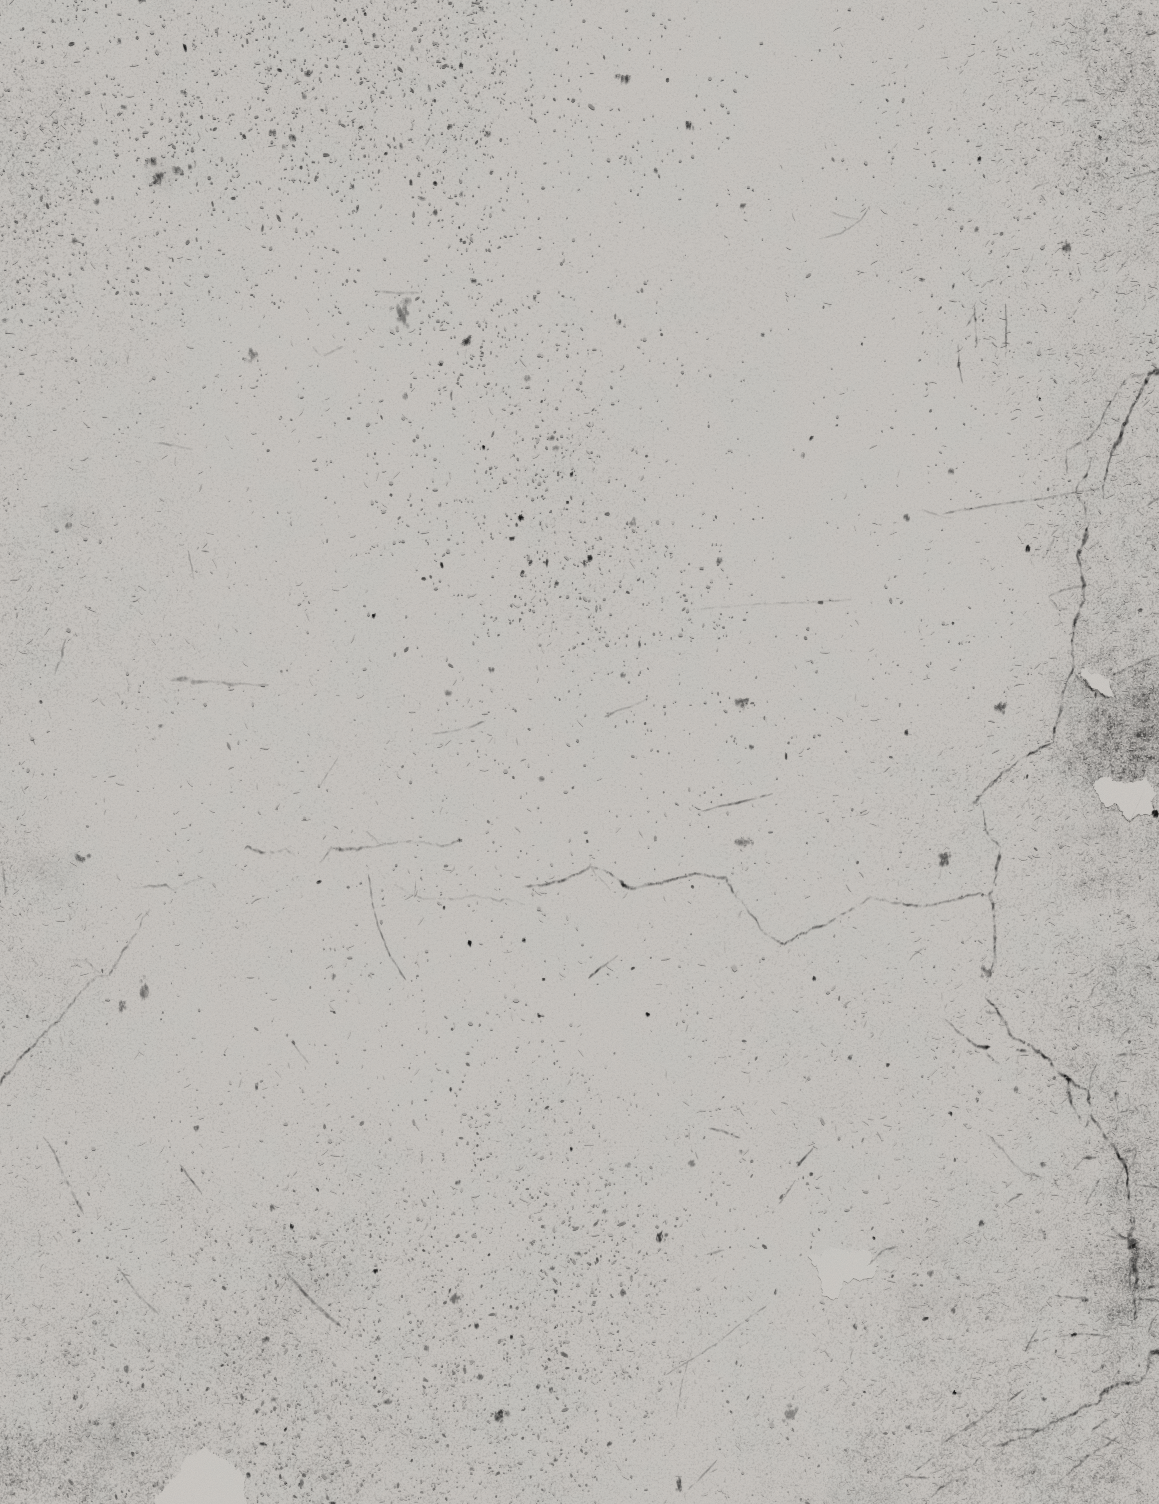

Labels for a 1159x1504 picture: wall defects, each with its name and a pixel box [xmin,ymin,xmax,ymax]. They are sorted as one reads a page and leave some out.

crack [976,369,1159,800]
peeling [1080,668,1113,698]
peeling [1093,777,1159,823]
crack [969,998,1154,1318]
crack [1070,1381,1130,1415]
peeling [154,1447,250,1504]